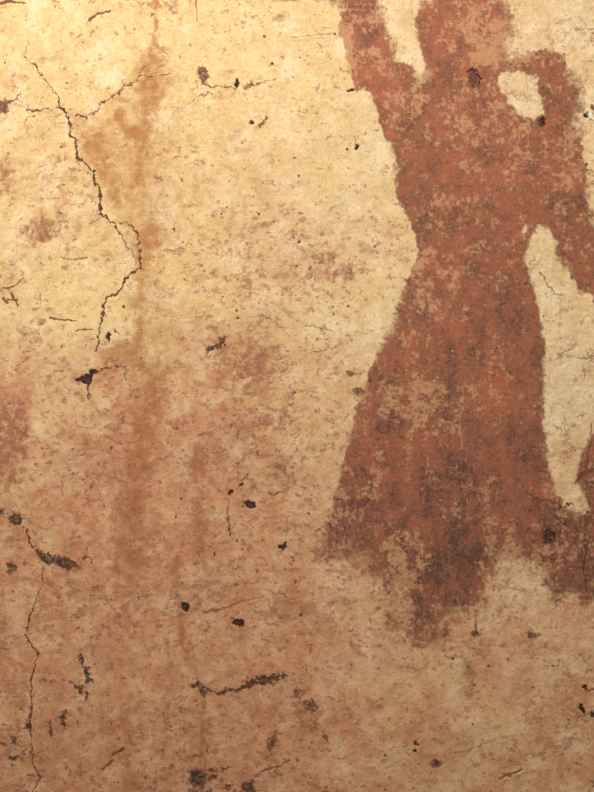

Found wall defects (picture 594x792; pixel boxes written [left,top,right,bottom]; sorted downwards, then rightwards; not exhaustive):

crack [23,44,169,402]
crack [1,568,44,792]